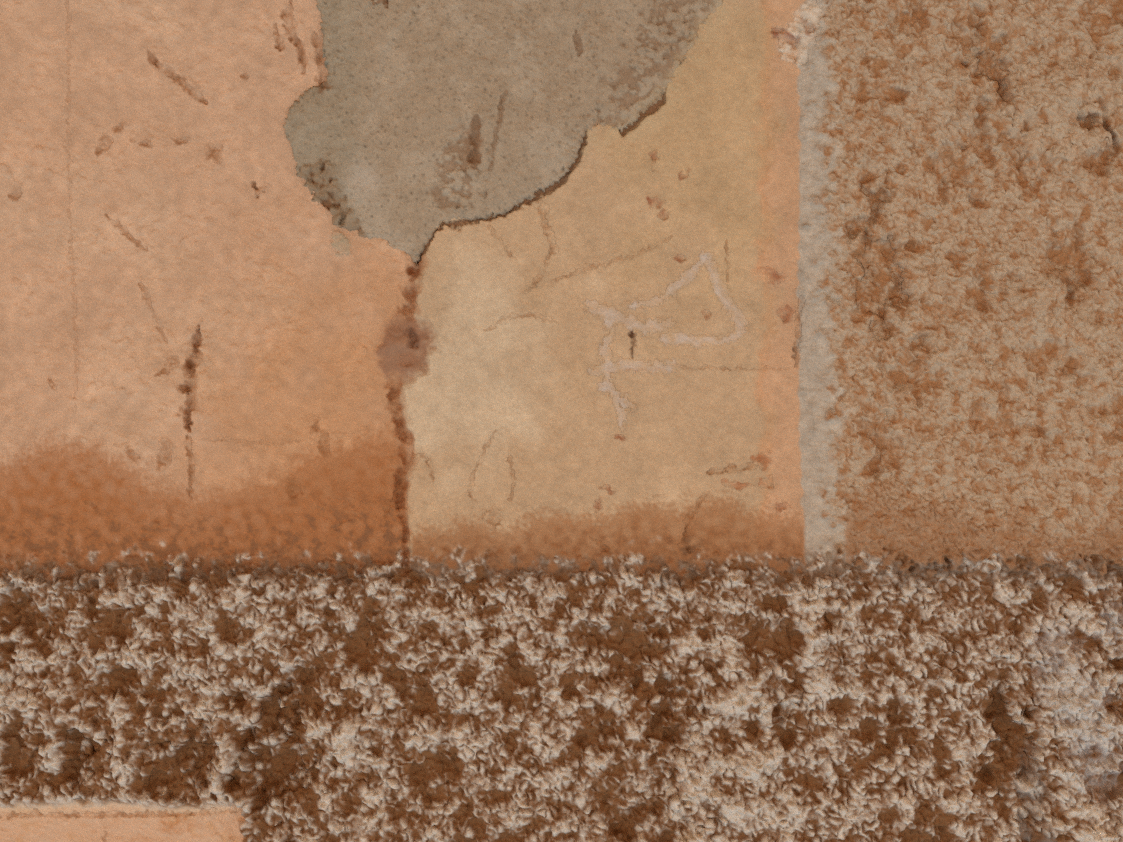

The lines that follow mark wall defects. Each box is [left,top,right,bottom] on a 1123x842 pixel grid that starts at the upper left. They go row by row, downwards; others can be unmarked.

spalling [296,159,368,238]
crack [397,135,672,331]
crack [382,380,434,579]